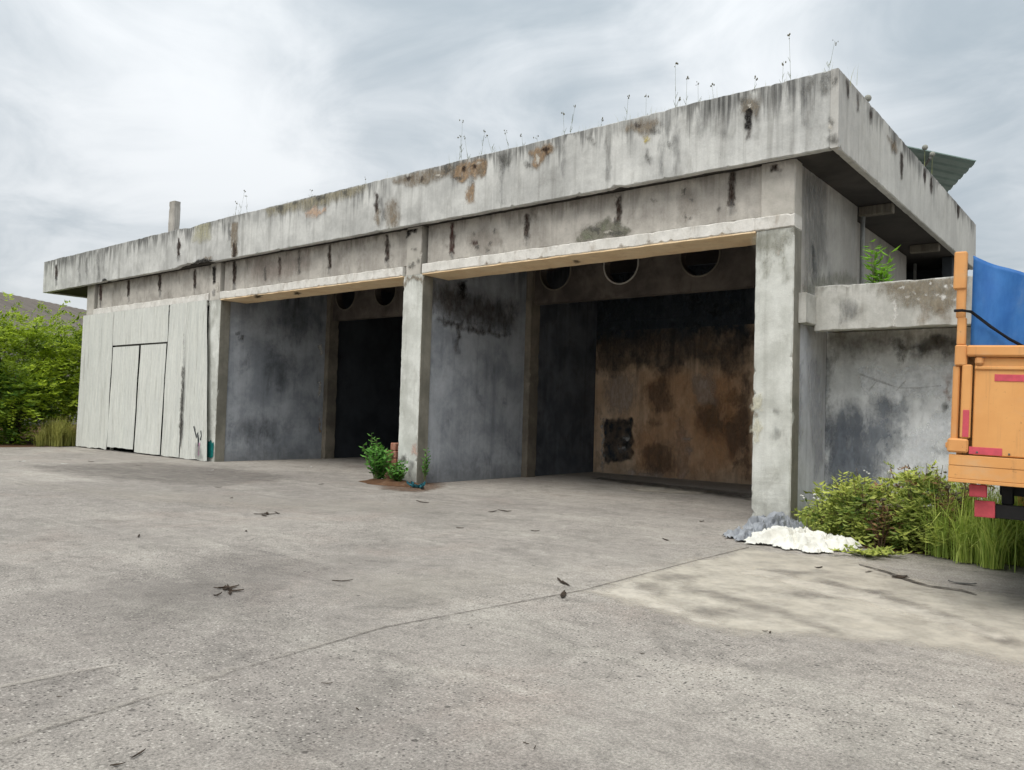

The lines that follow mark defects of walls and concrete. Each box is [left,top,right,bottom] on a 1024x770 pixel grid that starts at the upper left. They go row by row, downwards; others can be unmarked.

leakage [228,222,238,257]
leakage [432,287,514,331]
leakage [597,375,748,498]
leakage [799,335,956,497]